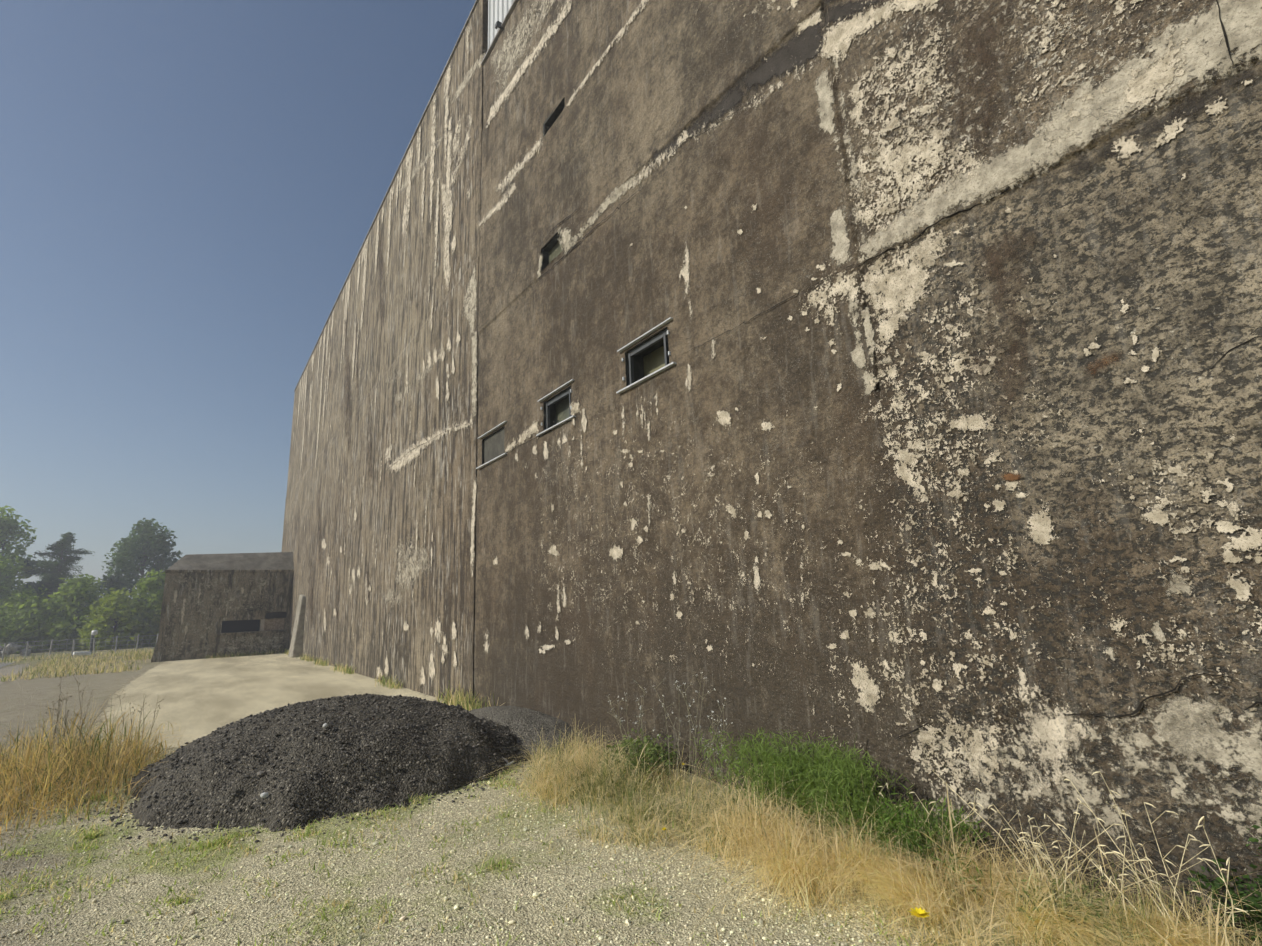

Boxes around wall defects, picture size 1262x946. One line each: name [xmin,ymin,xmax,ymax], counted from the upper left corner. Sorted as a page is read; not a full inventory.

water stain [632,0,883,189]
water stain [1141,72,1251,138]
water stain [984,658,1135,804]
crack [1064,673,1225,718]